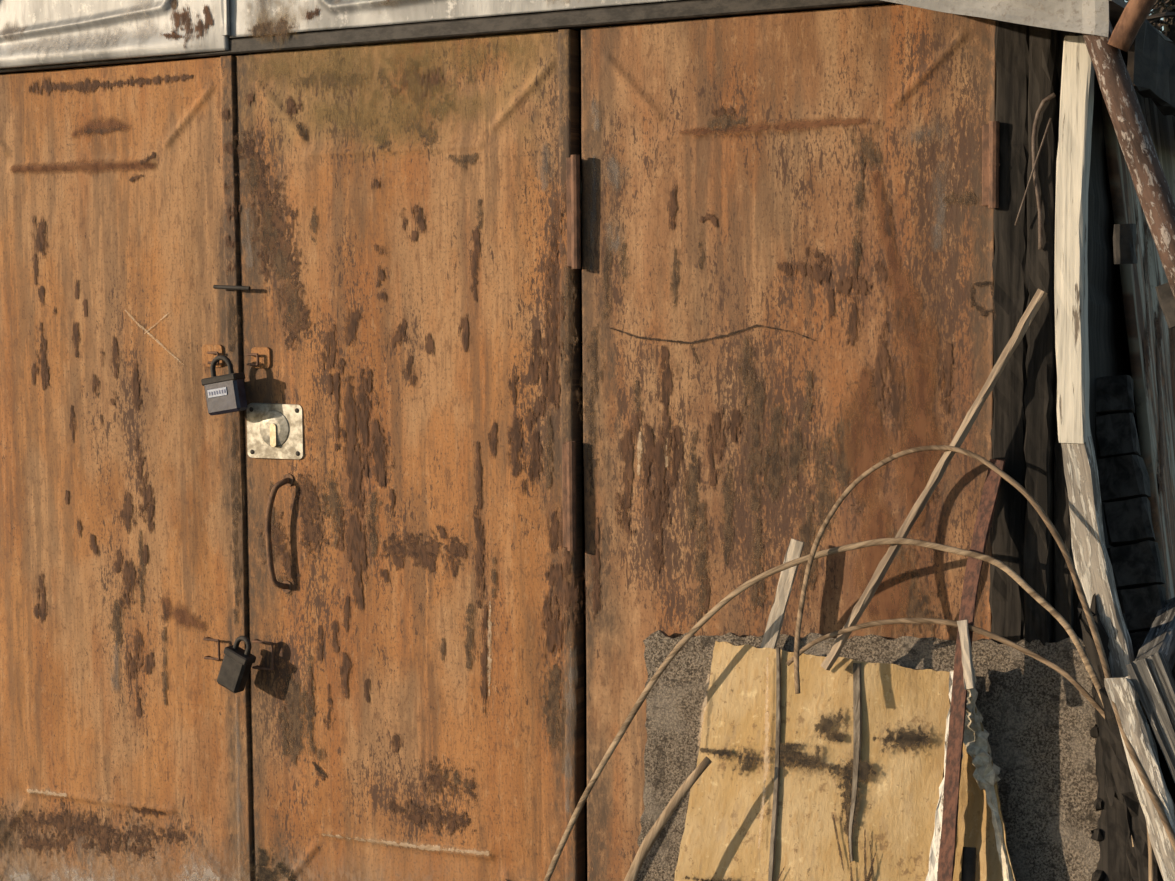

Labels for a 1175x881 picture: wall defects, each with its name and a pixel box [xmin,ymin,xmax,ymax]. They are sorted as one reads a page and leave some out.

corrosion [29,74,192,97]
corrosion [163,0,213,48]
corrosion [11,152,155,184]
corrosion [31,217,56,315]
corrosion [470,199,482,301]
crack [610,324,816,364]
corrosion [777,155,962,639]
corrosion [108,438,204,717]
corrosion [316,308,395,730]
corrosion [464,375,545,713]
corrosion [538,511,603,658]
corrosion [615,345,741,622]